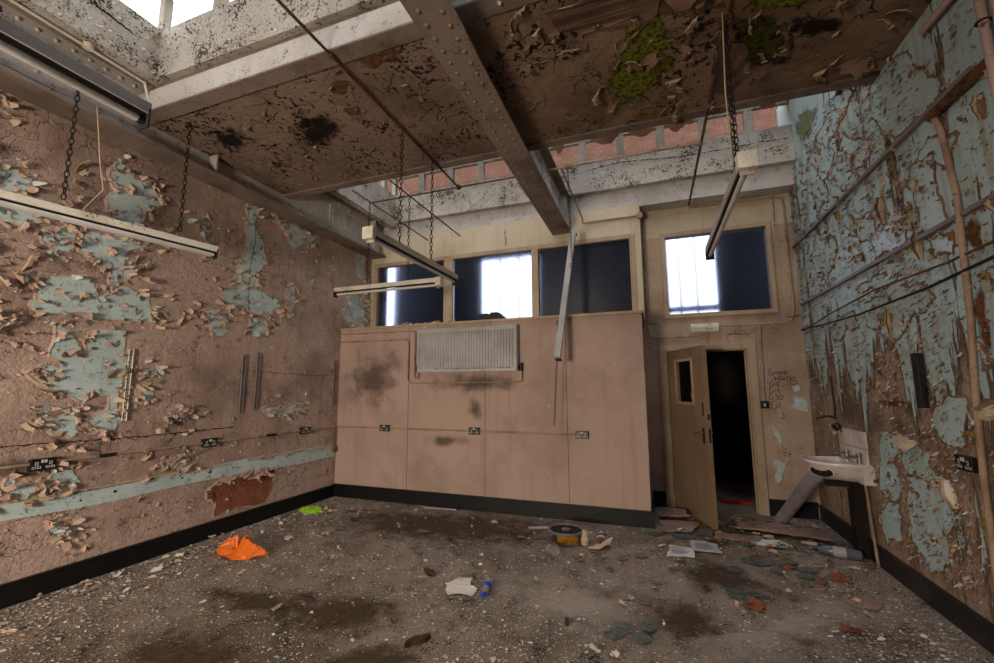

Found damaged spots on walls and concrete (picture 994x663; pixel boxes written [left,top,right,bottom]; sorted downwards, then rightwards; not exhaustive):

peeling [167,12,283,59]
peeling [514,0,790,114]
damp [788,16,843,37]
peeling [0,93,38,131]
peeling [590,78,693,145]
peeling [746,0,994,603]
peeling [588,537,613,550]